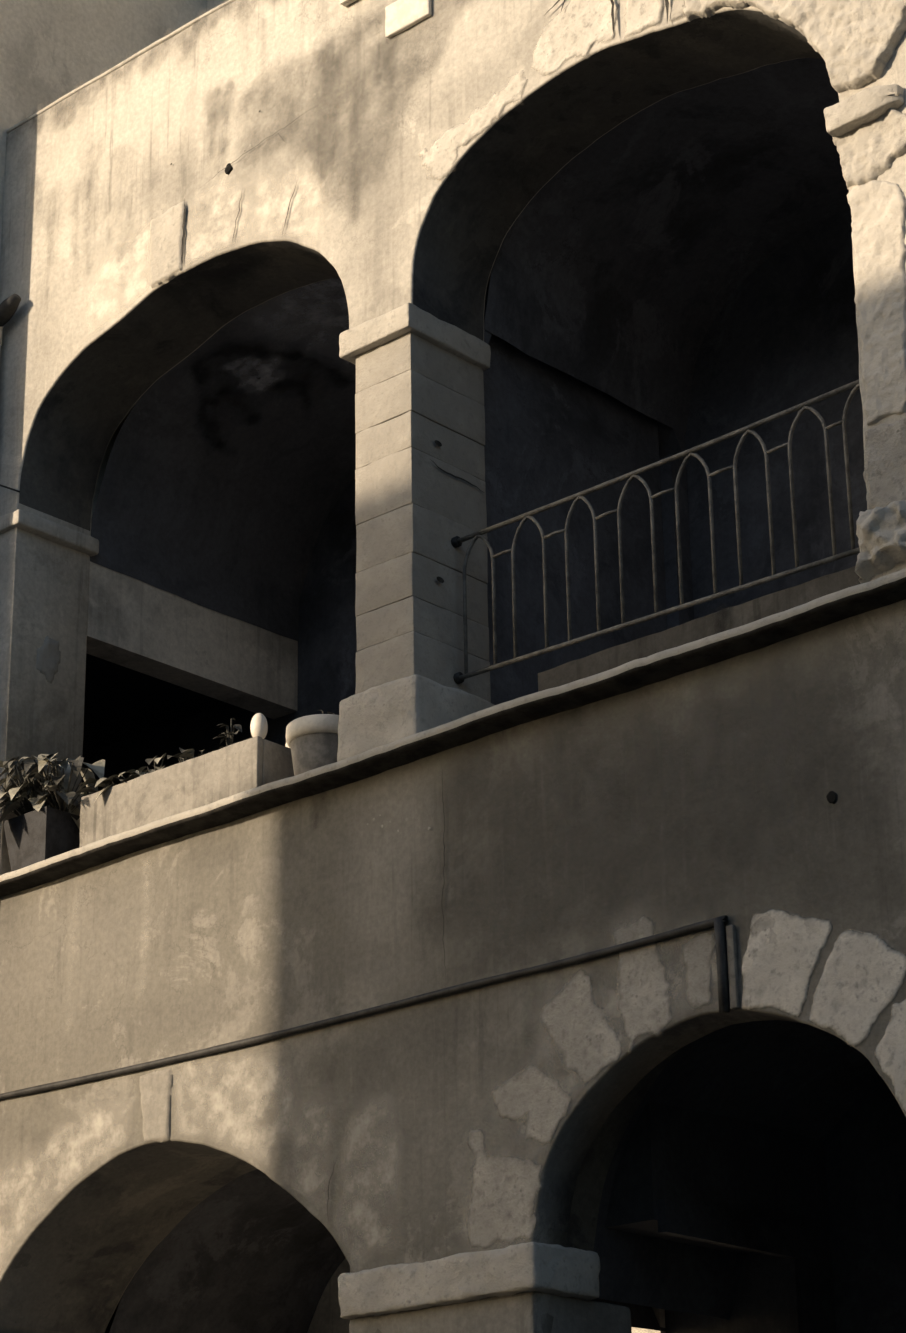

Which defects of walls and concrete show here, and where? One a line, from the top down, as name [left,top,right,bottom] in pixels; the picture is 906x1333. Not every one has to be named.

crack [608,0,616,38]
crack [663,0,671,22]